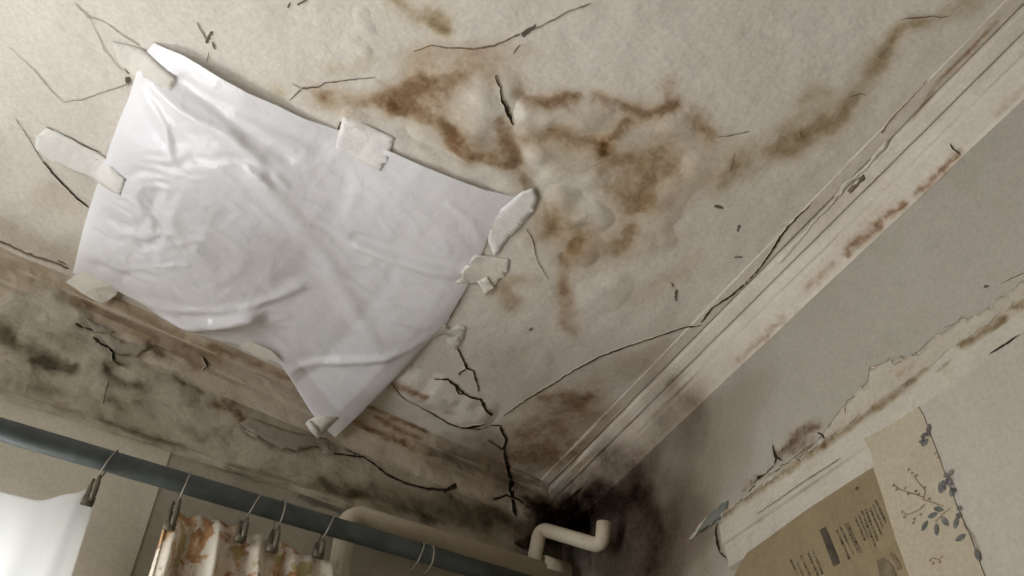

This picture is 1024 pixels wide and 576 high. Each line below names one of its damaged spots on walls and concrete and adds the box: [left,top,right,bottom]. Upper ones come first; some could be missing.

crack [9,4,140,103]
crack [289,77,375,101]
crack [414,3,591,54]
crack [880,80,928,134]
crack [15,118,99,207]
mould [30,356,76,370]
crack [74,323,125,404]
crack [391,204,811,517]
peeling [688,281,1024,540]
crack [332,449,448,492]
damp [524,483,683,576]